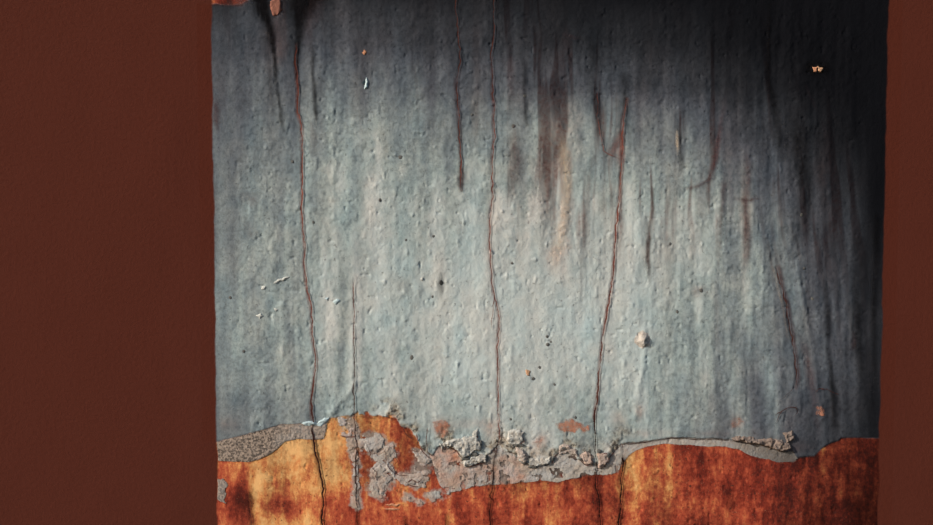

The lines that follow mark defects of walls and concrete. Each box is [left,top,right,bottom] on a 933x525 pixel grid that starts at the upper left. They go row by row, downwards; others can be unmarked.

crack [454,0,462,188]
crack [294,45,325,525]
crack [351,283,359,523]
crack [489,0,500,525]
peeling [217,416,798,510]
corrosion [216,412,880,525]
crack [593,94,743,525]